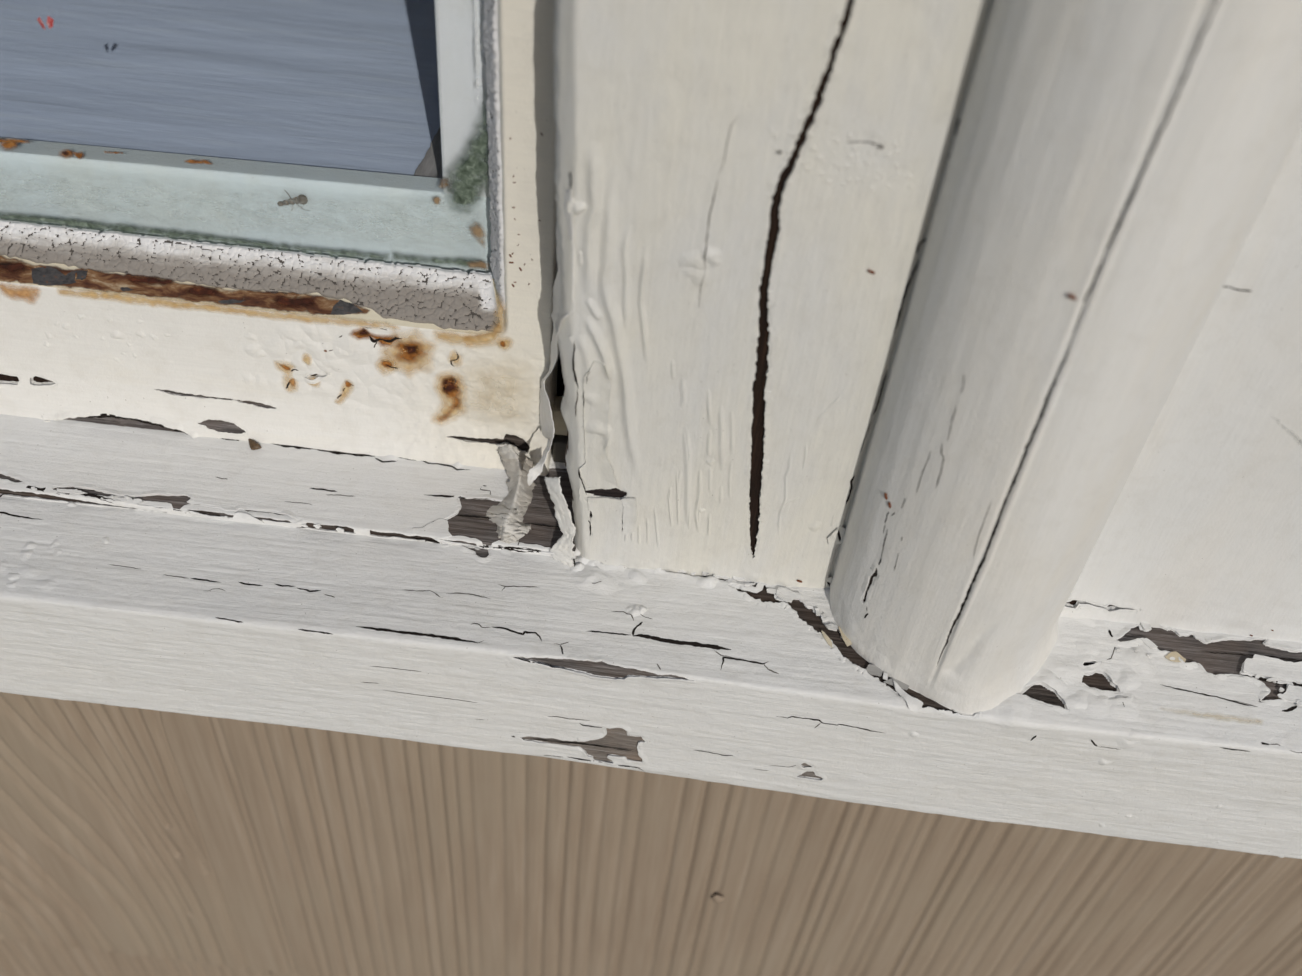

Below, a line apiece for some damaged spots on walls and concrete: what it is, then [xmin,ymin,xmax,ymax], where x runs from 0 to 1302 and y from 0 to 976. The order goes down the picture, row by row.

crack [0,0,500,366]
corrosion [0,256,510,371]
crack [572,0,863,593]
corrosion [280,356,310,389]
corrosion [437,376,463,421]
peeling [412,190,637,567]
peeling [0,472,344,532]
crack [113,565,335,623]
crack [361,585,778,674]
peeling [1010,654,1127,714]
peeling [1112,622,1302,707]
peeling [512,716,648,770]